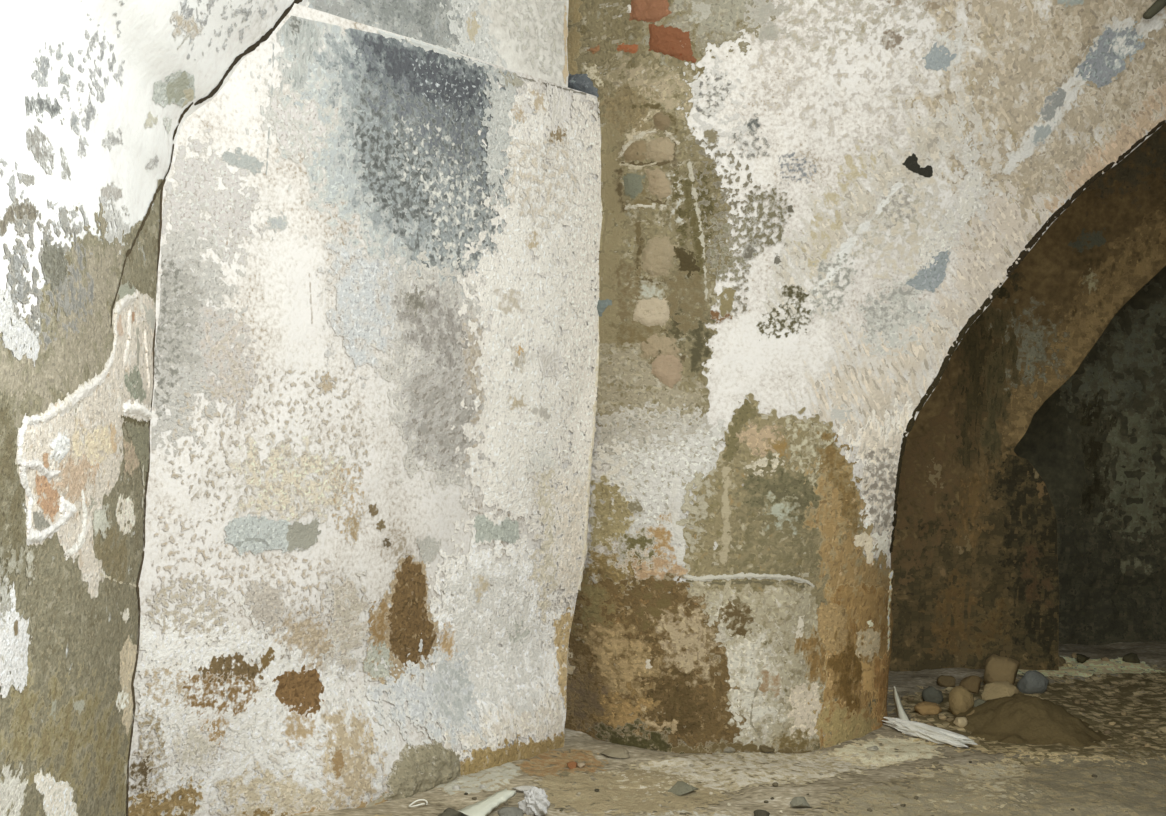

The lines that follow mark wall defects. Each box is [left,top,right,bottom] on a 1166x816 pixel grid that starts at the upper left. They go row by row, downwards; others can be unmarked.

spalling [144,69,196,135]
crack [111,0,303,327]
crack [307,273,315,324]
flaking render [391,0,777,559]
crack [889,120,1166,553]
crack [100,322,156,816]
rust [150,362,459,684]
water stain [794,615,805,643]